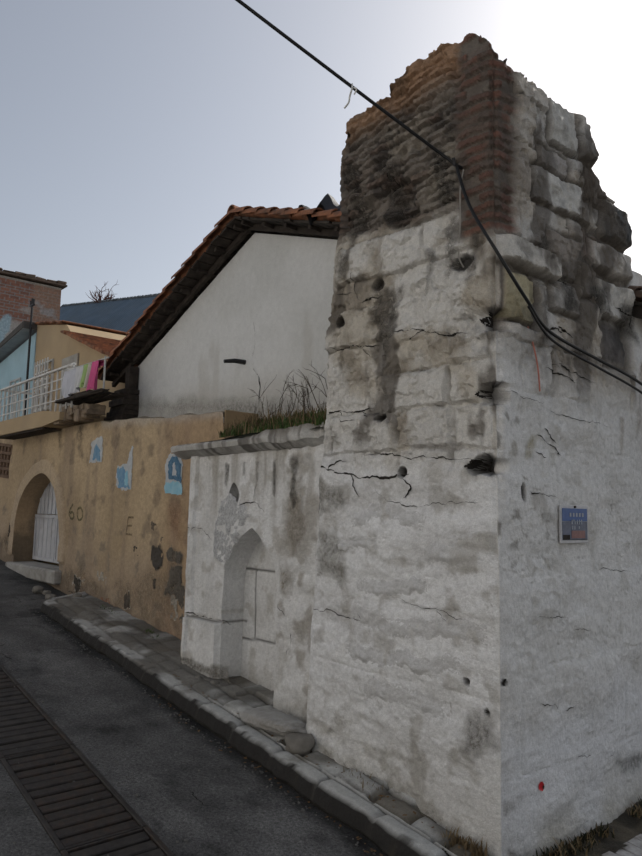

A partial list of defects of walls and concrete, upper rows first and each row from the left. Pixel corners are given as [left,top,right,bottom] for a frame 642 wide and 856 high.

crack [321,453,478,507]
flaking render [150,521,185,624]